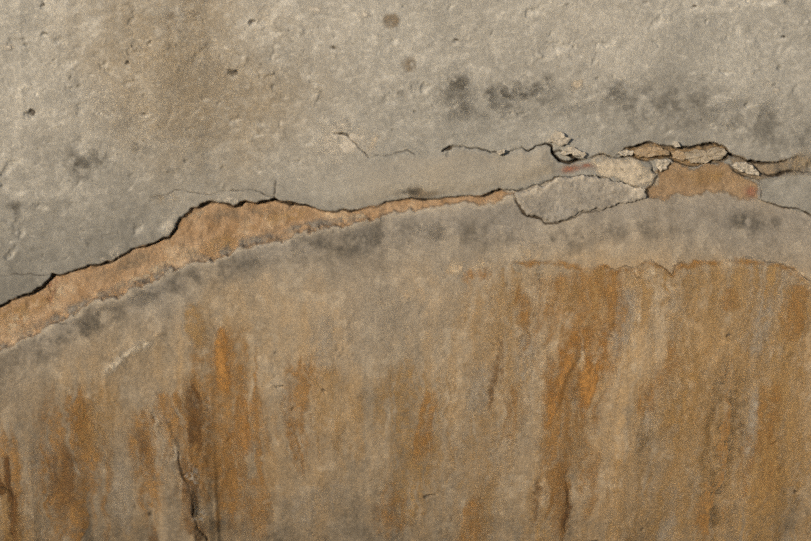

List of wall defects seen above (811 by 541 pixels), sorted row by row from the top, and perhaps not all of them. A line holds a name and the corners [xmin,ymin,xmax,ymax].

crack [0,227,177,307]
crack [199,190,310,208]
spalling [0,130,810,350]
crack [481,189,599,225]
crack [526,142,652,164]
crack [673,142,792,177]
peeling [105,334,157,373]
corrosion [159,328,264,541]
corrosion [547,265,626,529]
corrosion [0,440,21,541]